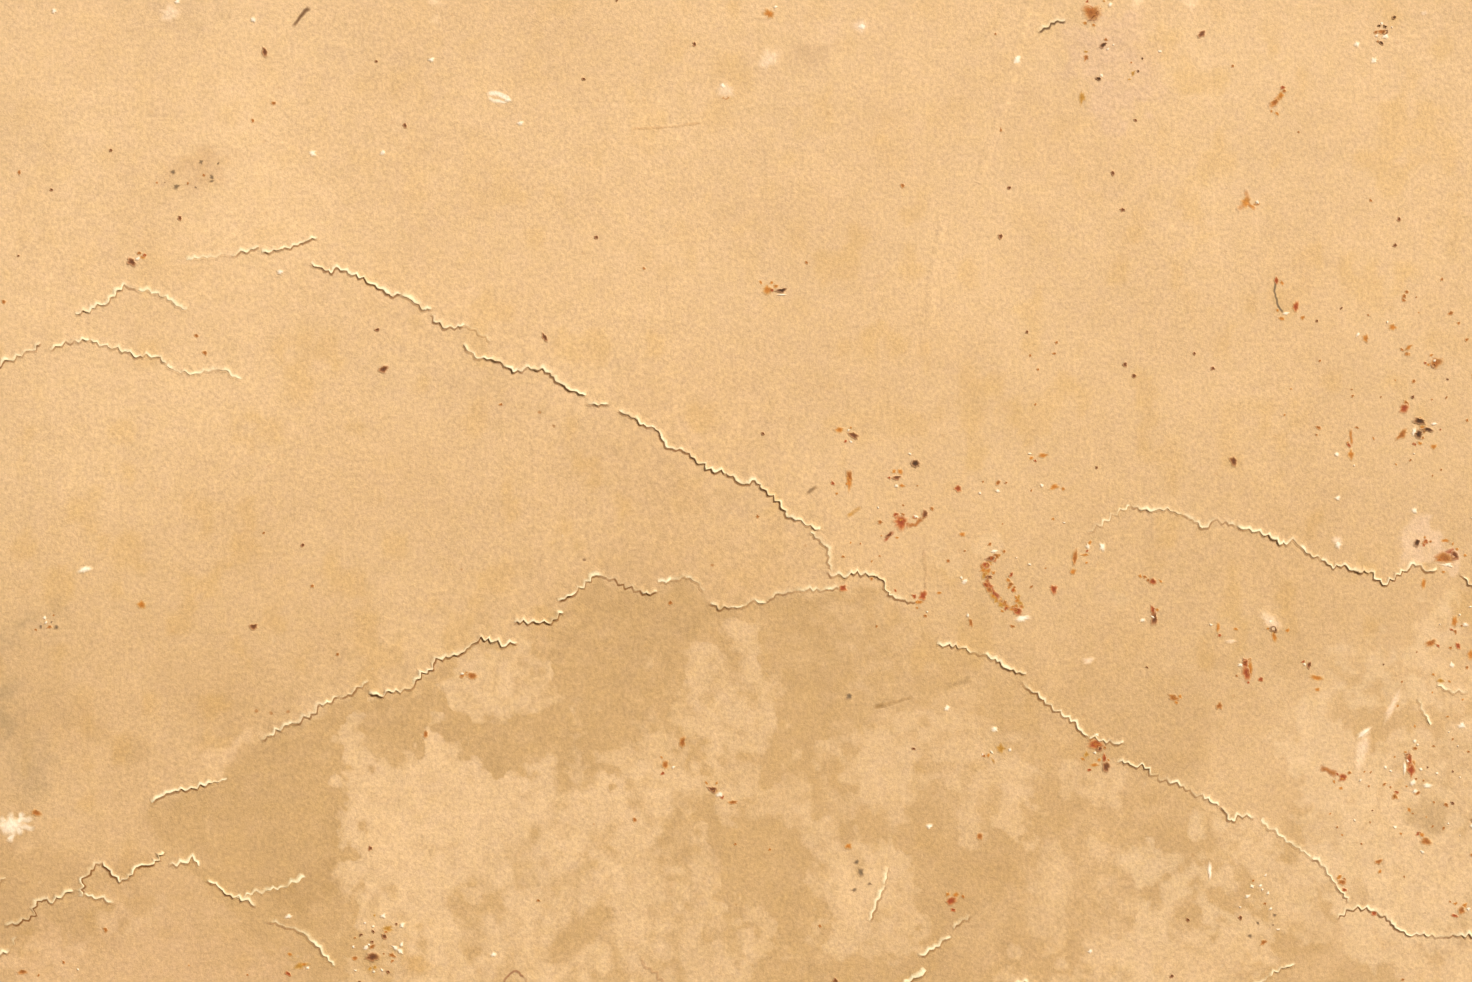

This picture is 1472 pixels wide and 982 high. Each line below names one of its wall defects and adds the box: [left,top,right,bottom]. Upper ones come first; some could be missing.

peeling [0,504,1472,982]
rust [978,542,1032,628]